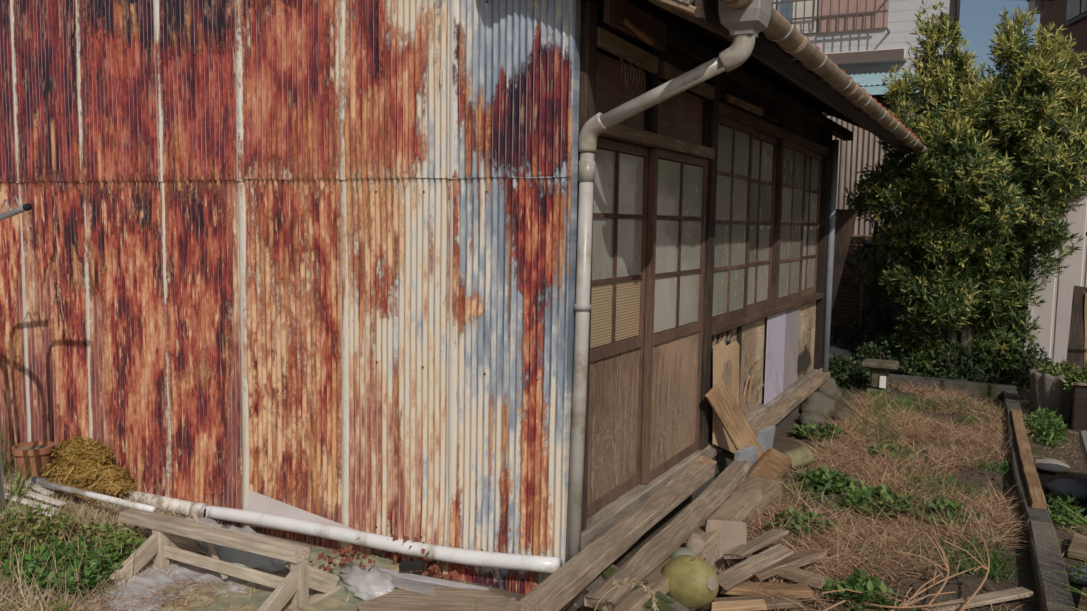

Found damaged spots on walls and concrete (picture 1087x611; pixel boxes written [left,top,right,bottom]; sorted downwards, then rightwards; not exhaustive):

corrosion [0,0,434,516]
corrosion [443,19,572,556]